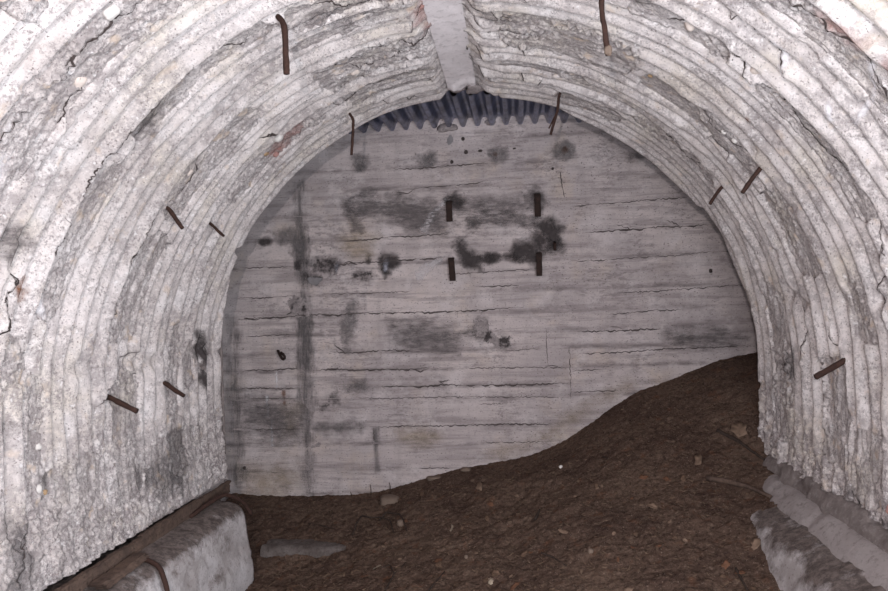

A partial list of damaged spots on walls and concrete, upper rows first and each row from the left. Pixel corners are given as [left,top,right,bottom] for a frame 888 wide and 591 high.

spalling [128,0,424,141]
spalling [311,30,439,155]
spalling [494,0,762,205]
water stain [259,184,339,302]
water stain [353,254,400,280]
water stain [344,192,441,233]
water stain [537,217,564,246]
spalling [760,187,823,278]